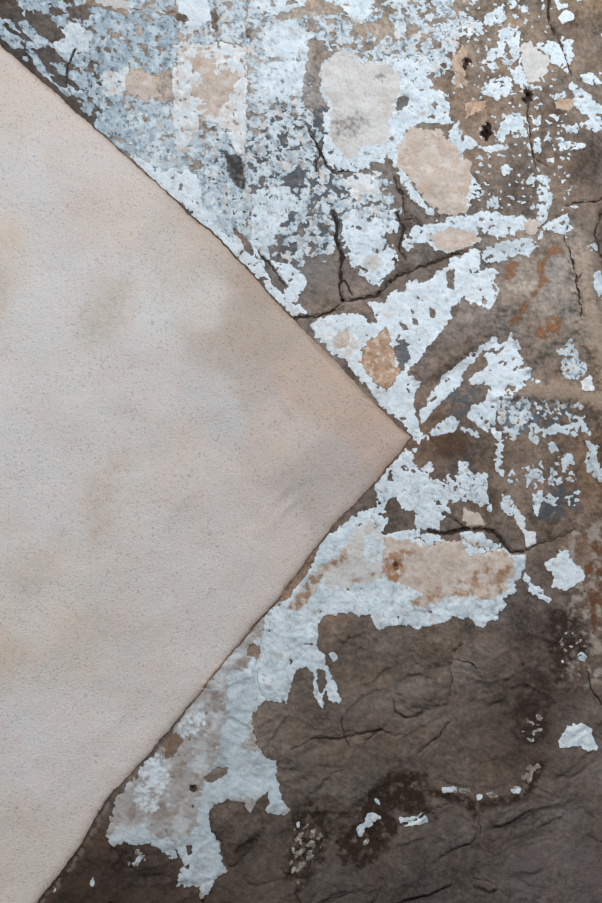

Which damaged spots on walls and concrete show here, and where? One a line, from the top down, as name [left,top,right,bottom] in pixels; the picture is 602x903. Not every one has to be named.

crack [547,0,572,77]
crack [308,129,348,178]
crack [525,89,546,168]
peeling [0,0,602,482]
crack [293,177,467,320]
crack [564,197,602,316]
peeling [522,442,580,516]
crack [428,513,574,553]
peeling [544,550,585,591]
peeling [106,448,552,899]
peeling [559,632,587,663]
peeling [558,723,598,752]